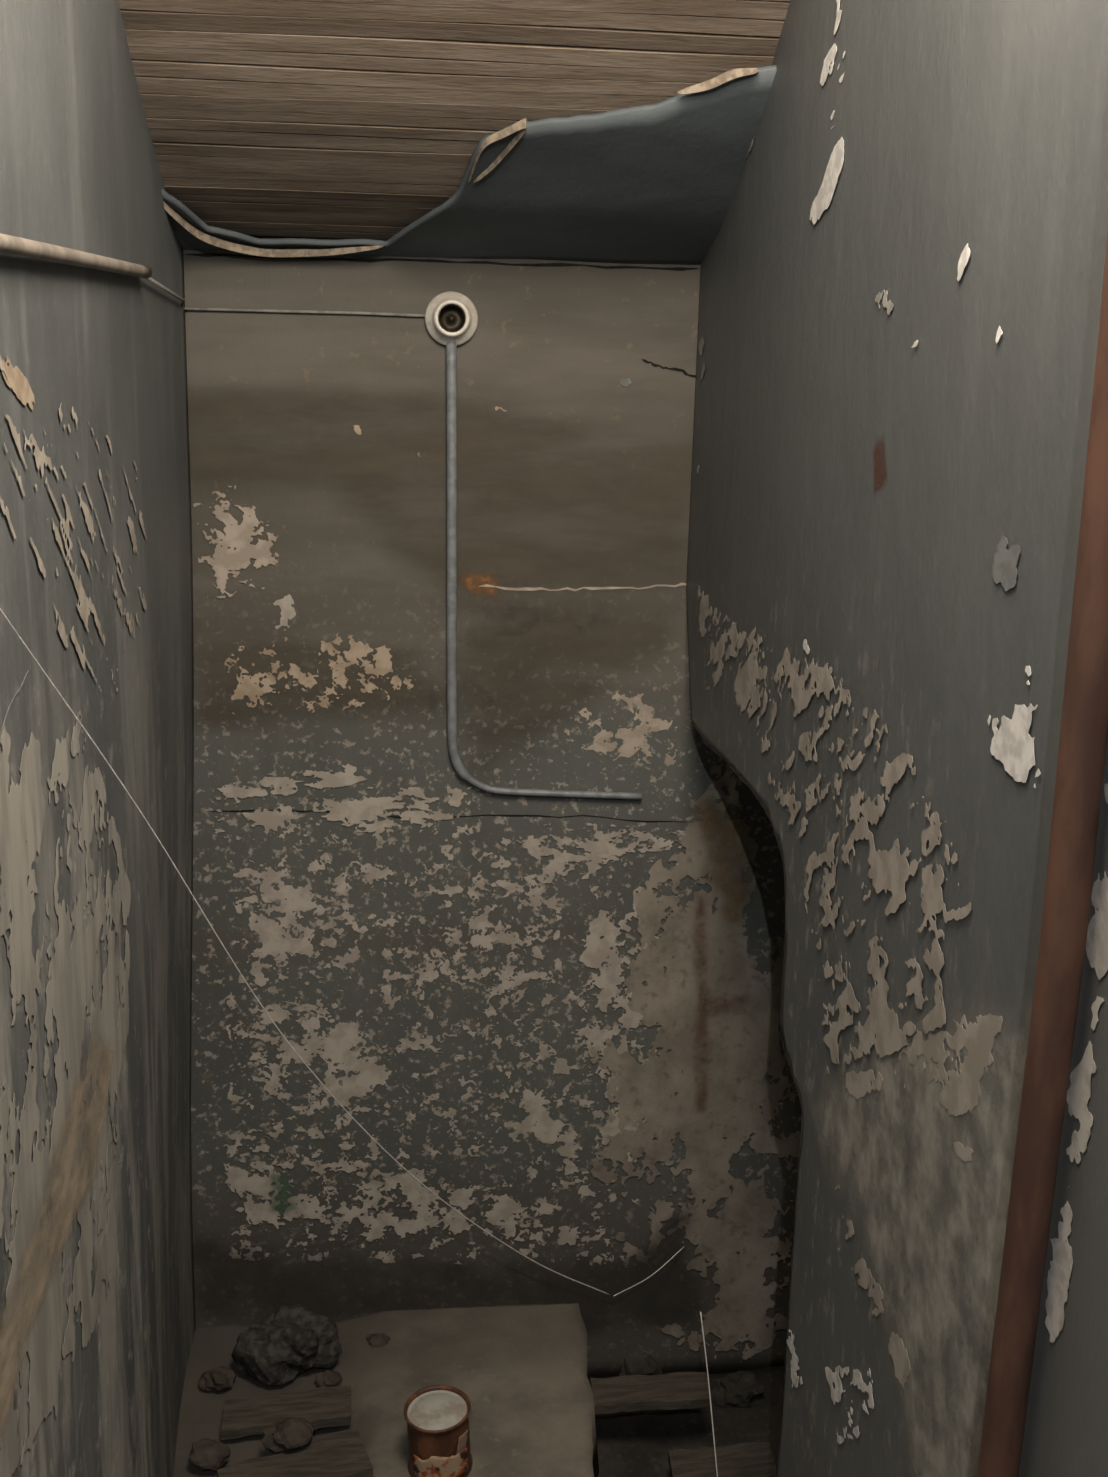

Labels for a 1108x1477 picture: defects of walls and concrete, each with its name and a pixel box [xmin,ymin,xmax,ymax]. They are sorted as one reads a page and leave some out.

peeling [820,0,845,86]
flaking render [118,0,791,257]
peeling [810,110,844,225]
peeling [957,244,970,281]
peeling [193,486,416,714]
peeling [992,536,1020,591]
peeling [564,690,678,767]
peeling [987,703,1041,788]
peeling [0,711,131,1477]
flaking render [212,756,802,1408]
peeling [698,585,1026,1477]